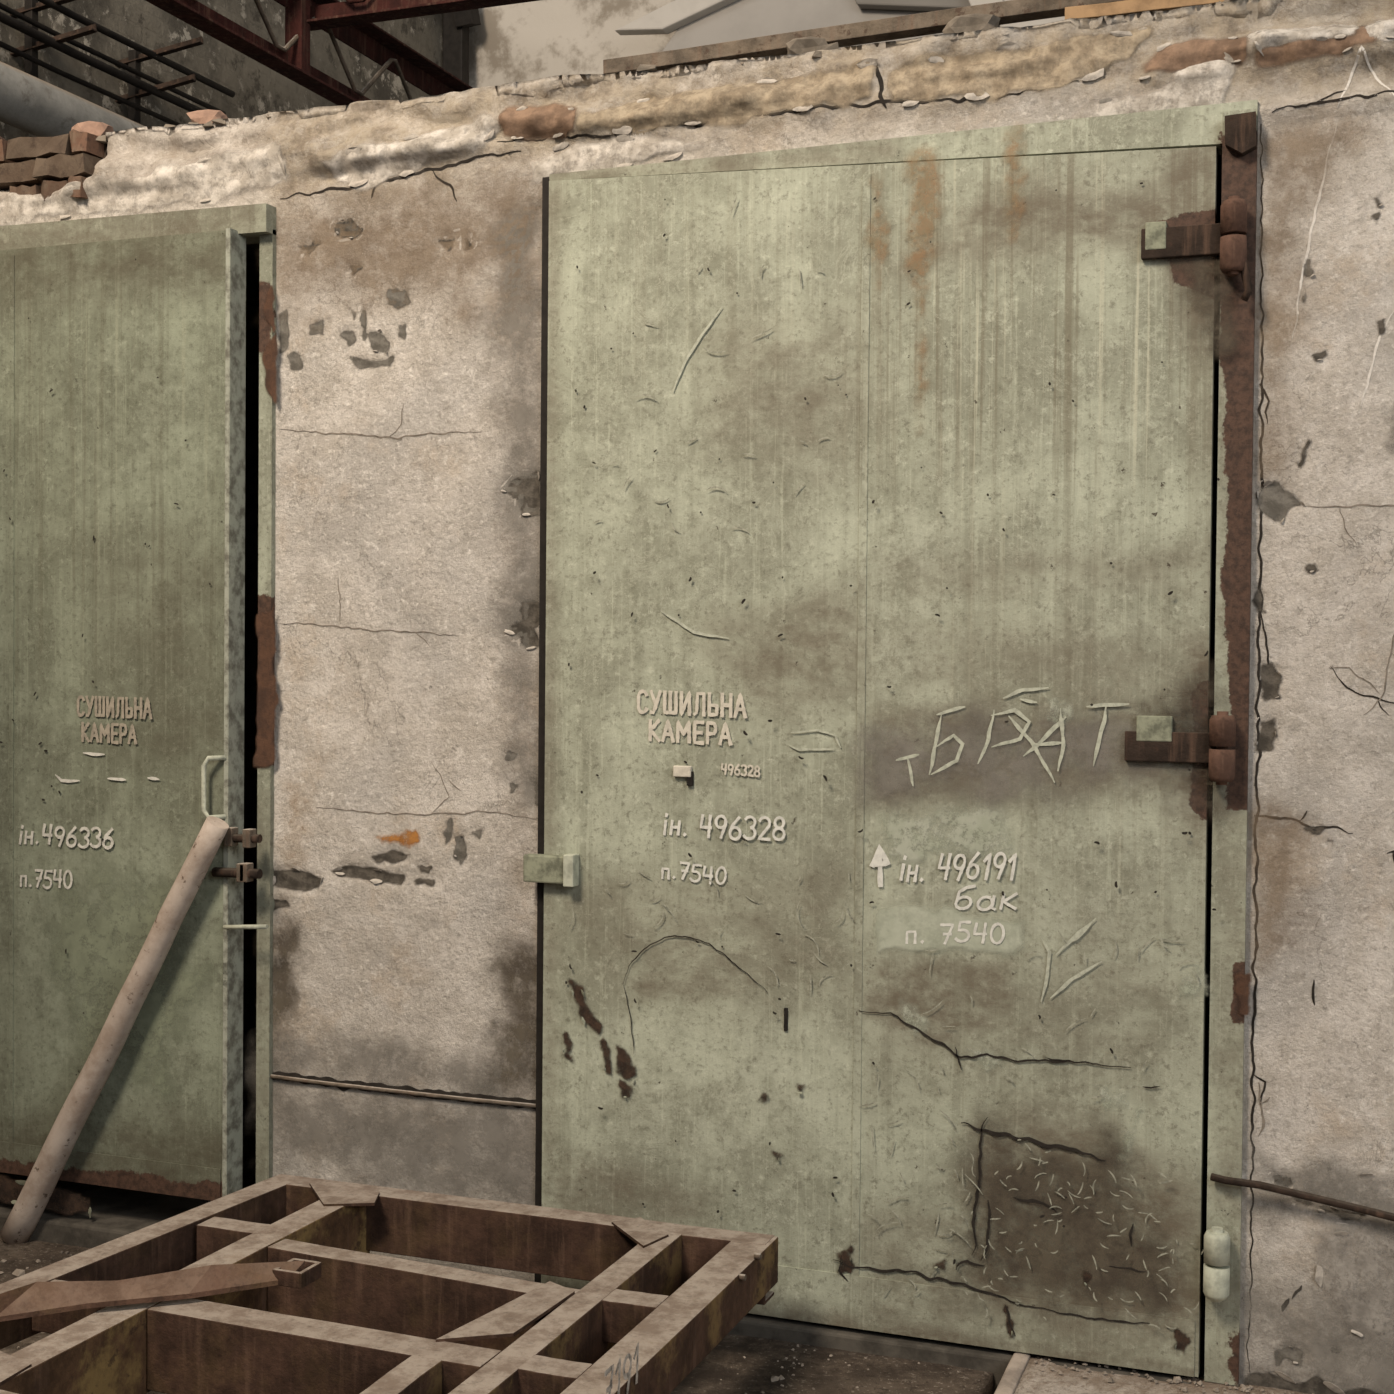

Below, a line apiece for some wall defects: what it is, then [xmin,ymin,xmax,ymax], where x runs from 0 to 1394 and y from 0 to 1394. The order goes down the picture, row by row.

crack [753,65,1079,116]
peeling [0,142,287,226]
crack [280,122,706,202]
rust [262,285,278,403]
spalling [279,310,303,370]
spalling [340,289,411,369]
rust [253,608,279,768]
crack [1246,90,1394,1372]
spalling [273,850,435,910]
spalling [443,818,482,865]
crack [859,1010,1160,1089]
crack [833,1117,1150,1335]